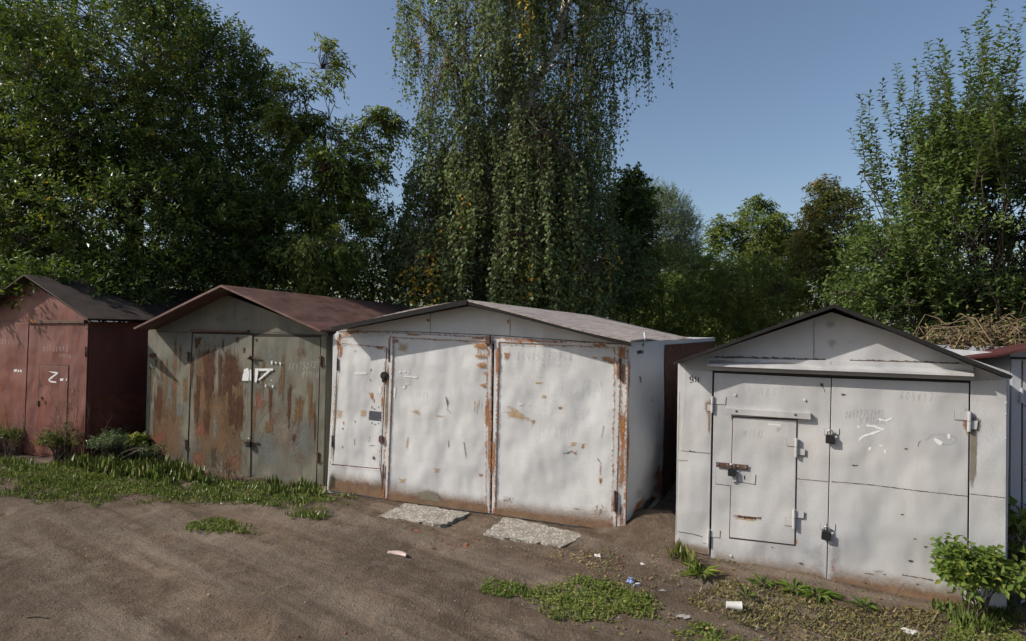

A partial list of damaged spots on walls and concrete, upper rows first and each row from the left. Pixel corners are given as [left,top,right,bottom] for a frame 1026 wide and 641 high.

corrosion [149,337,317,467]